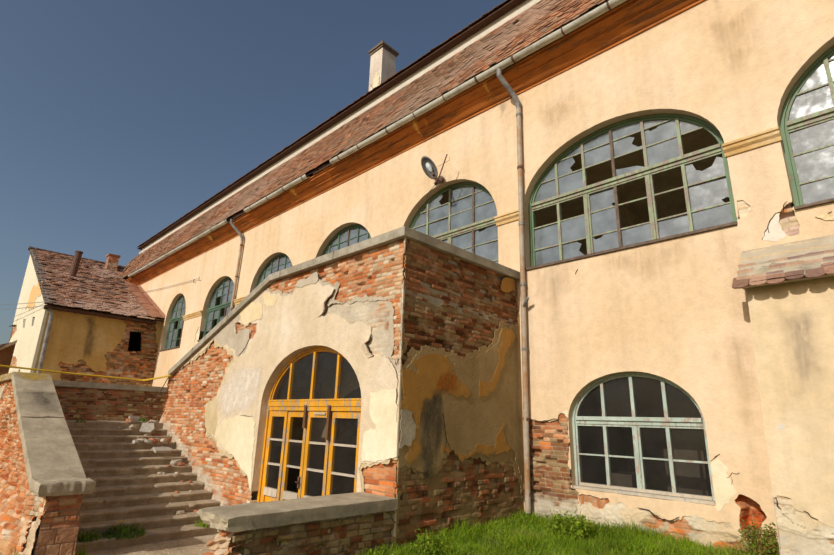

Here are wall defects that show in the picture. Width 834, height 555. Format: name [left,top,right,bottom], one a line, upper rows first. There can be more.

flaking render [762,203,800,241]
flaking render [54,239,610,549]
peeling [711,459,767,539]